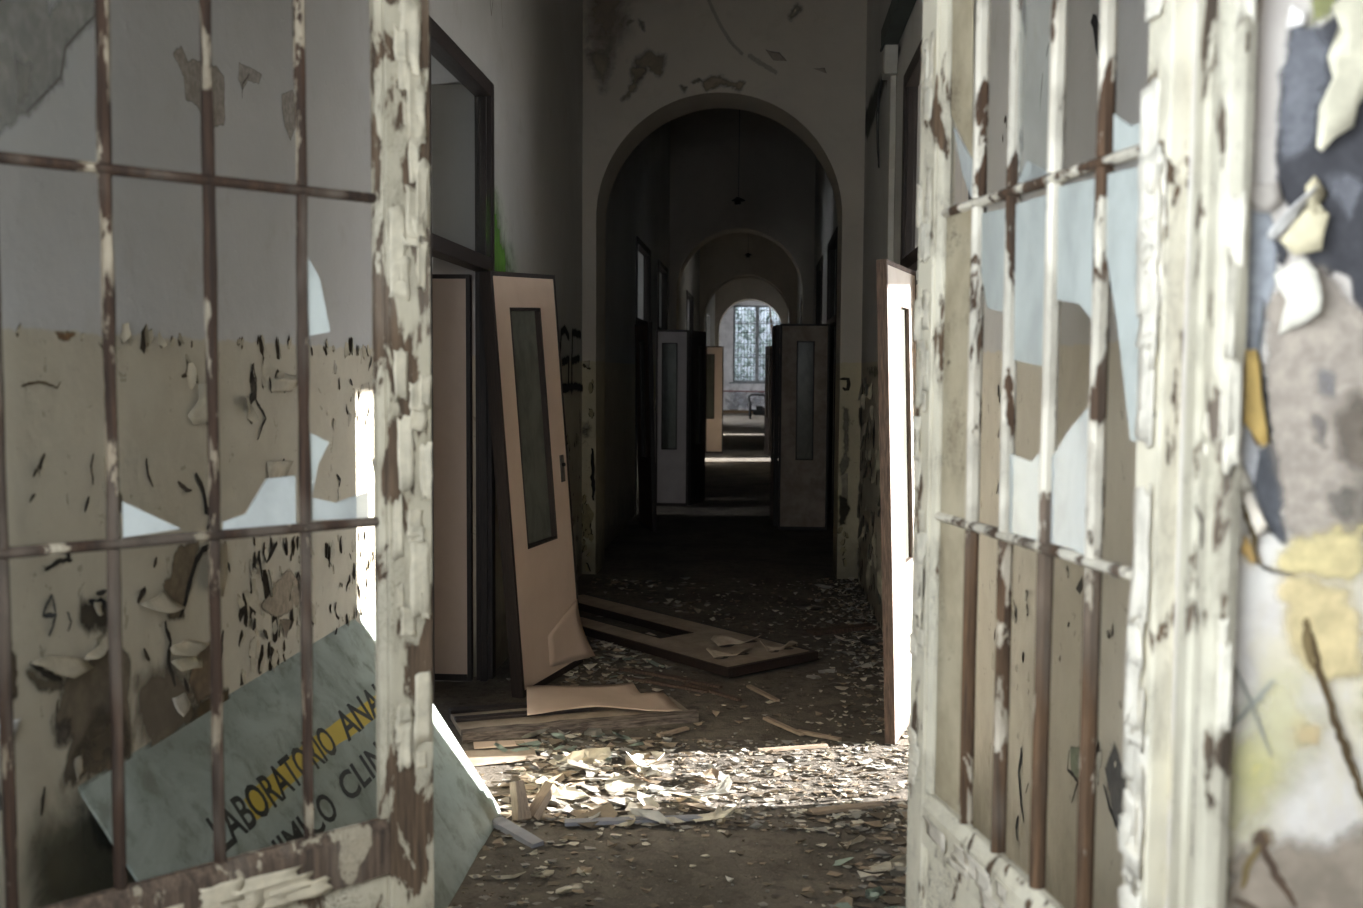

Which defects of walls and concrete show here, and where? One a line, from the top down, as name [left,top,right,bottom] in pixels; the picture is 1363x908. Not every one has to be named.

peeling [0,0,95,132]
leakage [623,51,665,100]
peeling [920,29,934,124]
peeling [1090,14,1099,61]
peeling [388,0,431,302]
peeling [1134,77,1167,448]
spalling [1203,0,1363,681]
spalling [12,472,374,786]
peeling [1096,483,1151,908]
peeling [1216,617,1233,736]
peeling [199,865,333,908]
spalling [1226,827,1363,908]